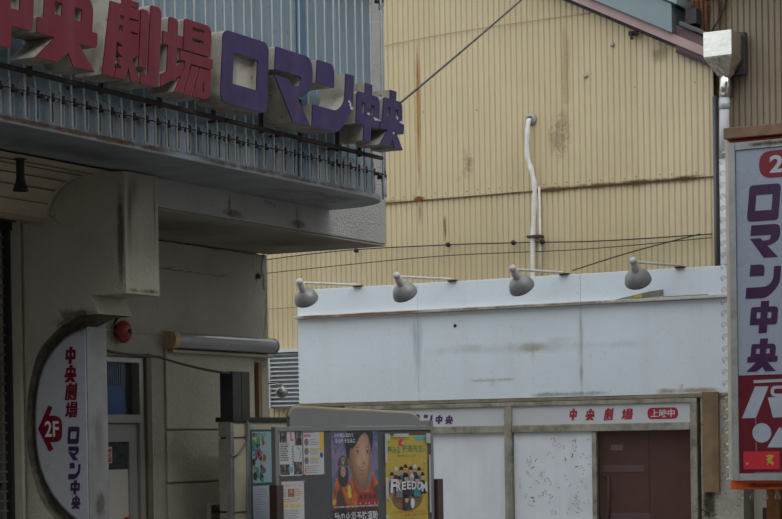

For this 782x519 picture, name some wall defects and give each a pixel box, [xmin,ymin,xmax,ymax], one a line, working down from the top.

rust [540,176,694,192]
crack [159,240,262,256]